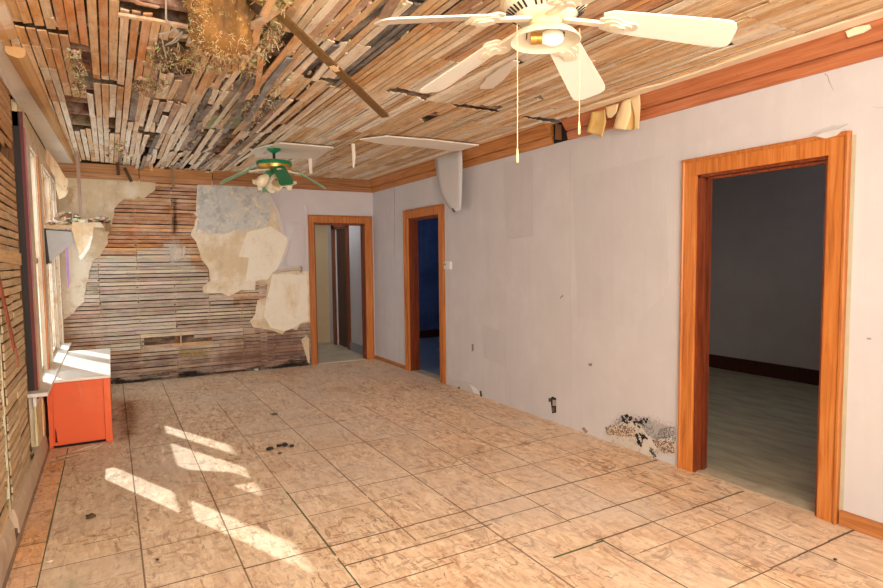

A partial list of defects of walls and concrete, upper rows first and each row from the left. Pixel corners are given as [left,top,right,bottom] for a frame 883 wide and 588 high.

flaking render [143,333,213,348]
flaking render [301,336,310,364]